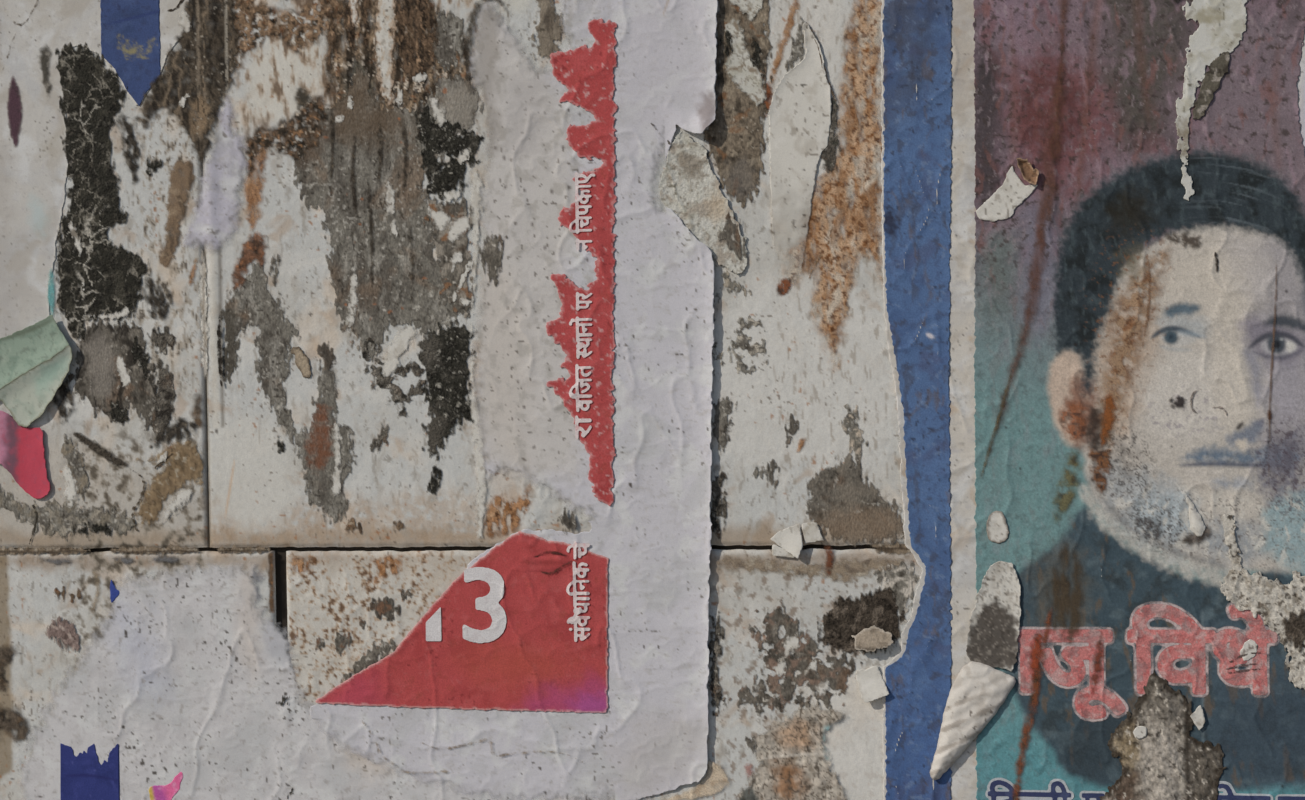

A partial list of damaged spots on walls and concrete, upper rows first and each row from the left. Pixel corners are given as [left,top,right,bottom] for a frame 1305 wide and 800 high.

peeling [68,222,82,253]
peeling [89,307,129,319]
spalling [199,251,362,534]
spalling [293,0,507,377]
peeling [469,362,486,537]
spalling [704,0,832,246]
rust [764,1,798,111]
rust [777,0,882,354]
rust [982,268,1039,472]
spalling [717,404,919,719]
peeling [1133,726,1147,739]
peeling [1190,705,1205,730]